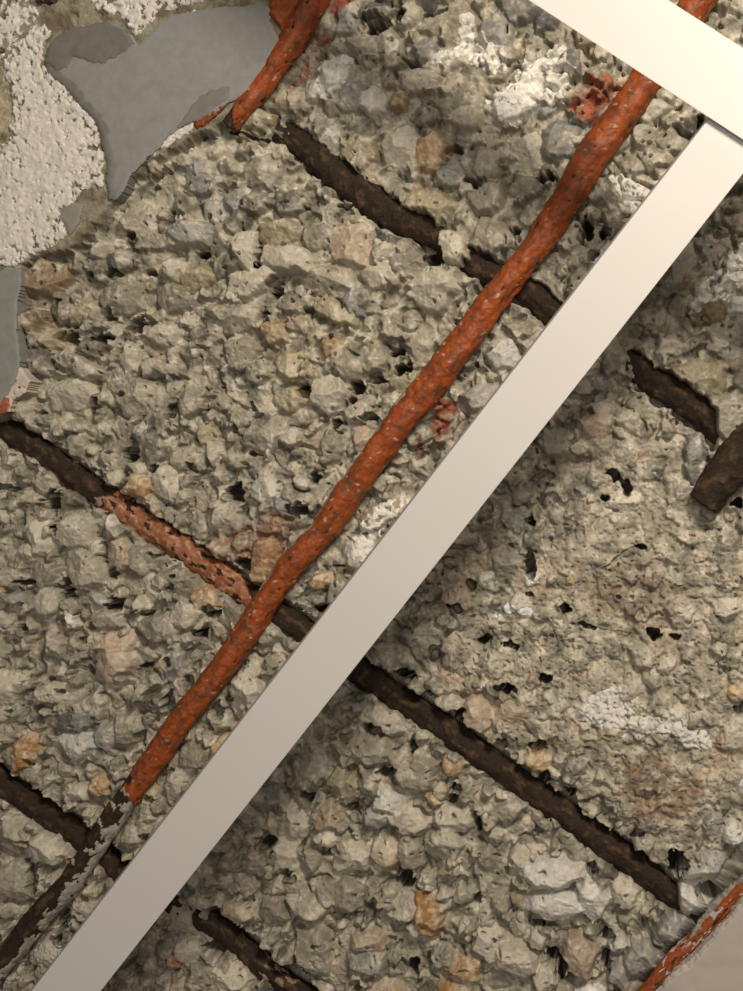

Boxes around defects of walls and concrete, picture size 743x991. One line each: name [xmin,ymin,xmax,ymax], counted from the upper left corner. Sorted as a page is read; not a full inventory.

rust [331,0,351,18]
spalling [669,0,743,48]
rust [570,73,623,125]
spalling [514,87,708,324]
spalling [0,0,633,607]
rust [433,399,457,442]
rust [217,514,292,576]
spalling [98,174,743,991]
spalling [0,438,246,945]
spalling [0,863,114,991]